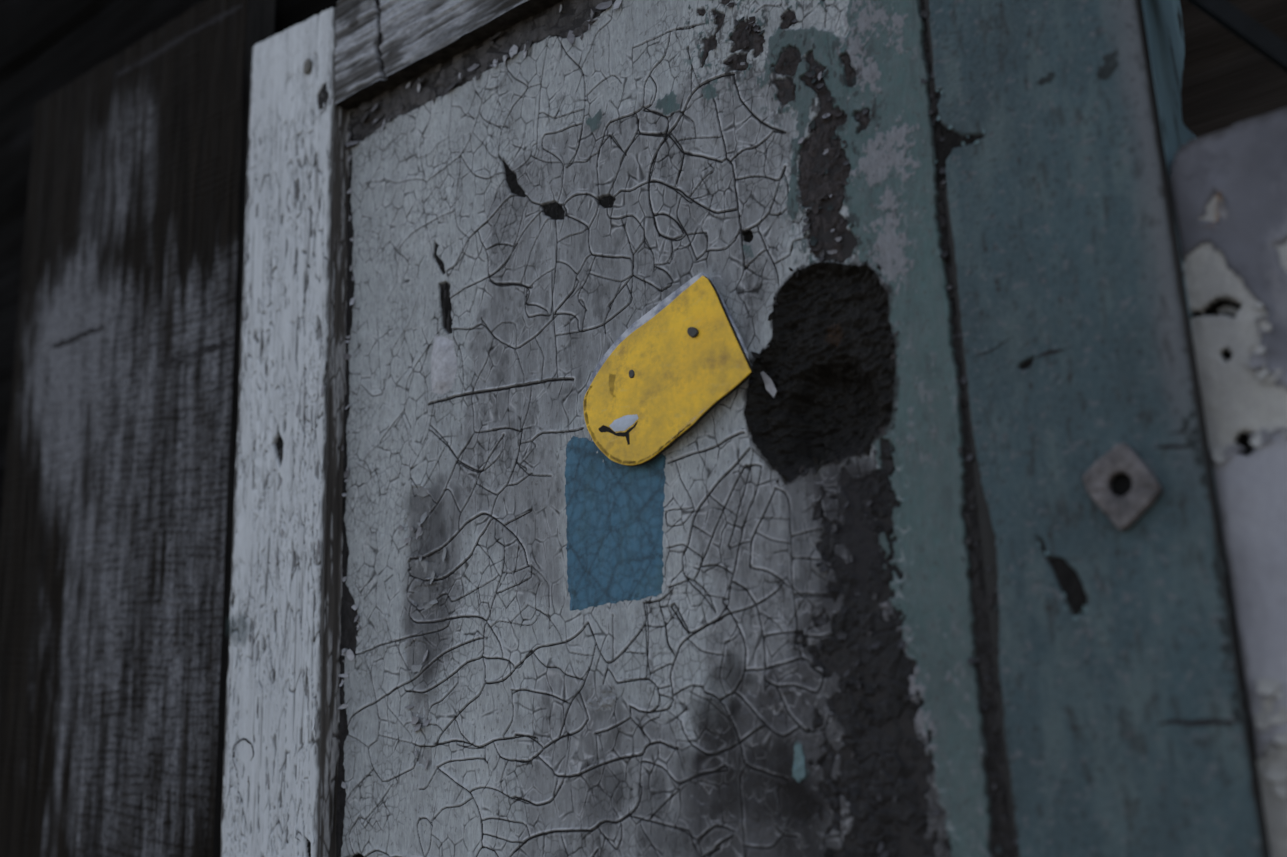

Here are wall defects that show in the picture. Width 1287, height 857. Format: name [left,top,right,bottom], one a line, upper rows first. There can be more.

crack [375,0,386,76]
peeling [697,0,765,70]
peeling [774,47,873,263]
peeling [336,0,622,857]
crack [345,12,849,857]
spalling [598,414,638,445]
peeling [761,371,777,398]
peeling [921,0,1019,857]
peeling [1183,242,1287,463]
peeling [795,440,951,857]
peeling [1038,542,1087,621]
peeling [1254,678,1287,857]